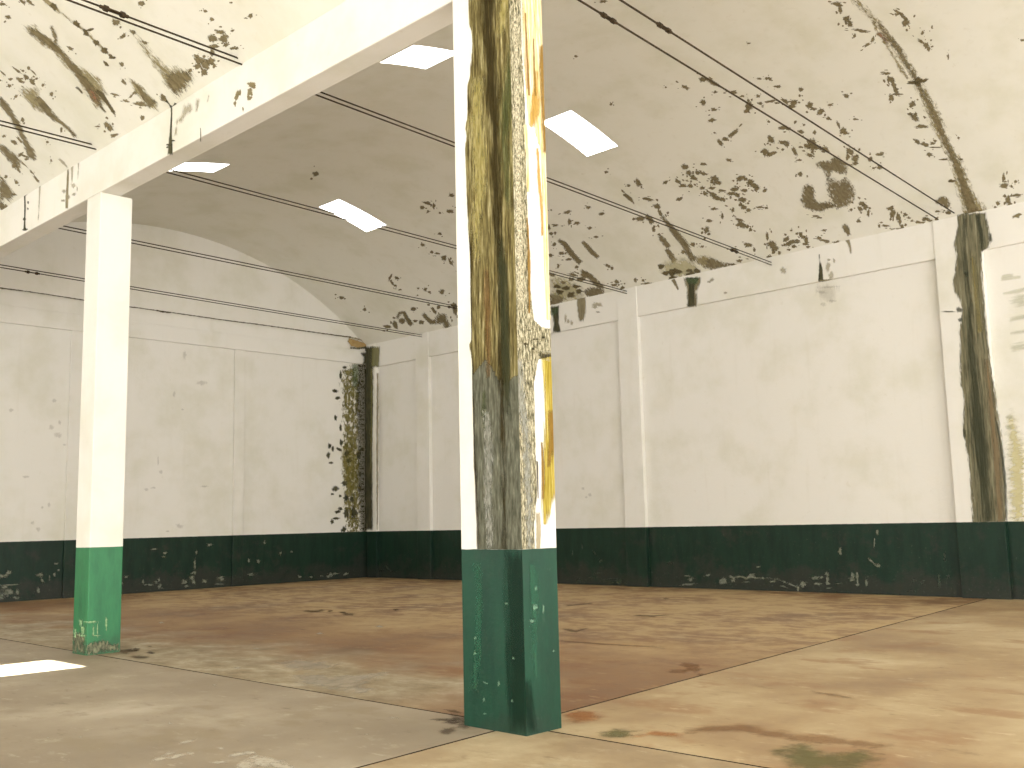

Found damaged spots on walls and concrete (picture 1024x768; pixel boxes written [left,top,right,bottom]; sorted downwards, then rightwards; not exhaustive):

peeling [189,10,244,76]
peeling [828,1,876,51]
peeling [890,8,933,52]
peeling [233,82,256,110]
peeling [696,73,884,177]
peeling [880,72,937,157]
peeling [548,205,650,289]
leakage [621,190,731,307]
peeling [663,163,951,265]
leakage [852,0,1023,522]
peeling [994,171,1023,208]
leakage [465,0,604,730]